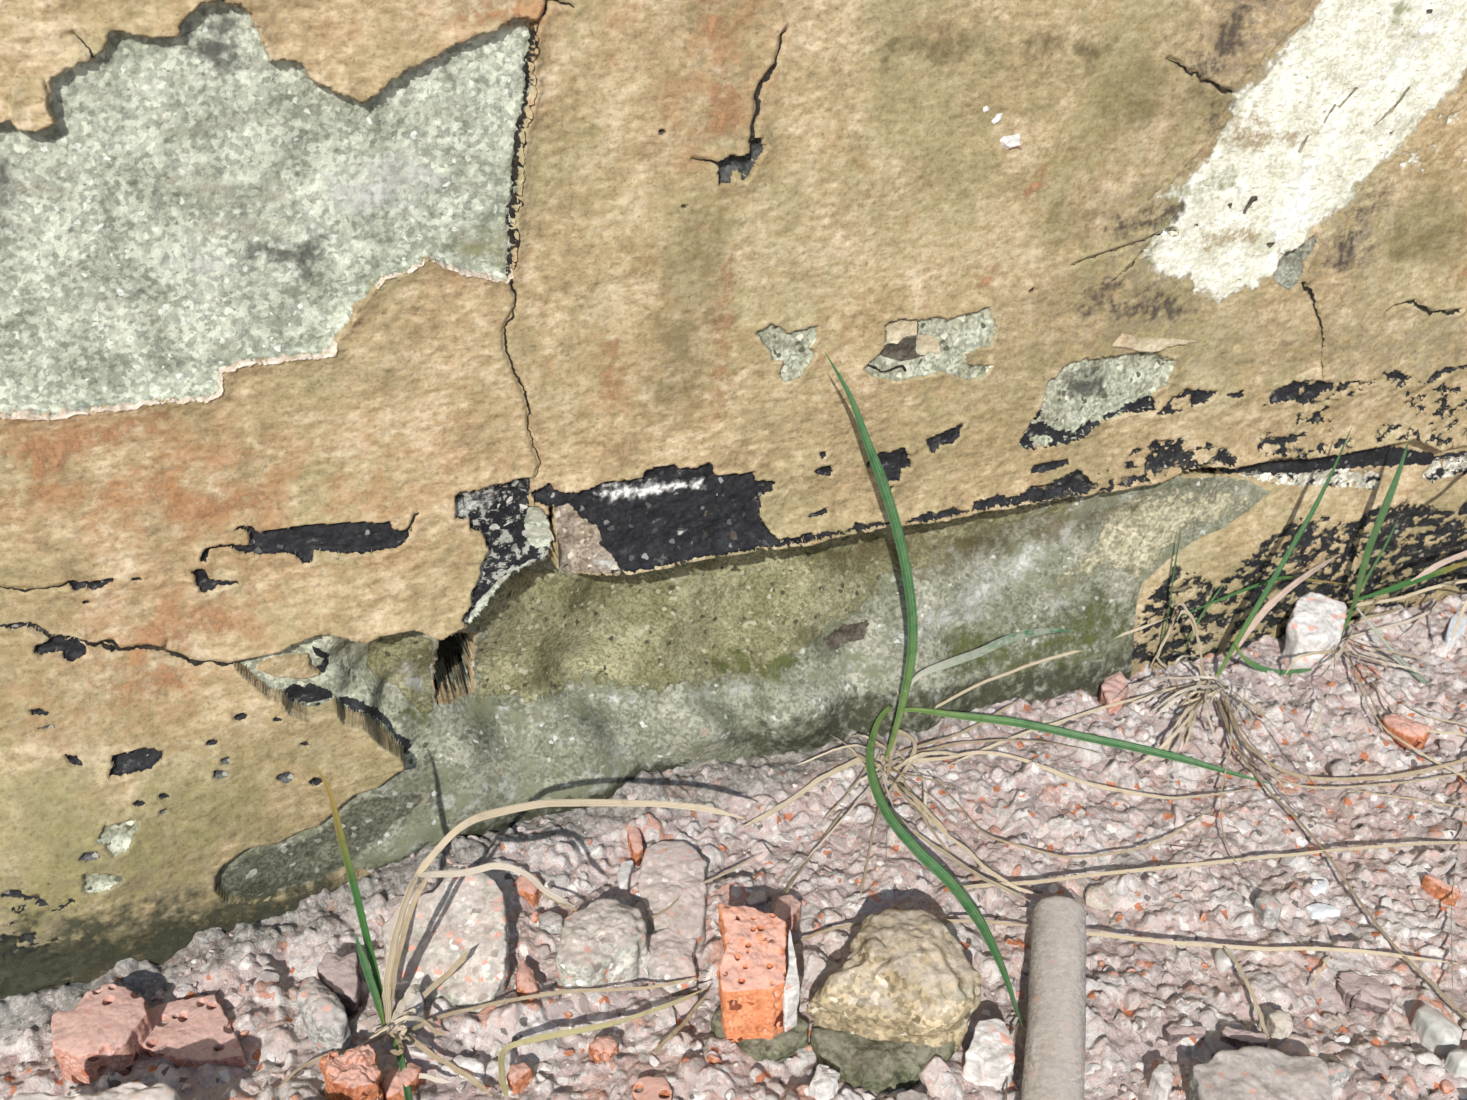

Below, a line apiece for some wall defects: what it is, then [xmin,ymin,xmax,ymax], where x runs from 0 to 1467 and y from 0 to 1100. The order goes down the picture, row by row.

crack [748,28,787,143]
crack [1166,58,1235,94]
peeling [1144,0,1467,304]
peeling [0,0,546,421]
crack [504,0,574,477]
peeling [756,324,817,382]
peeling [864,307,997,381]
crack [1301,281,1325,377]
crack [1387,299,1460,316]
crack [0,582,248,666]
spalling [192,333,1467,898]